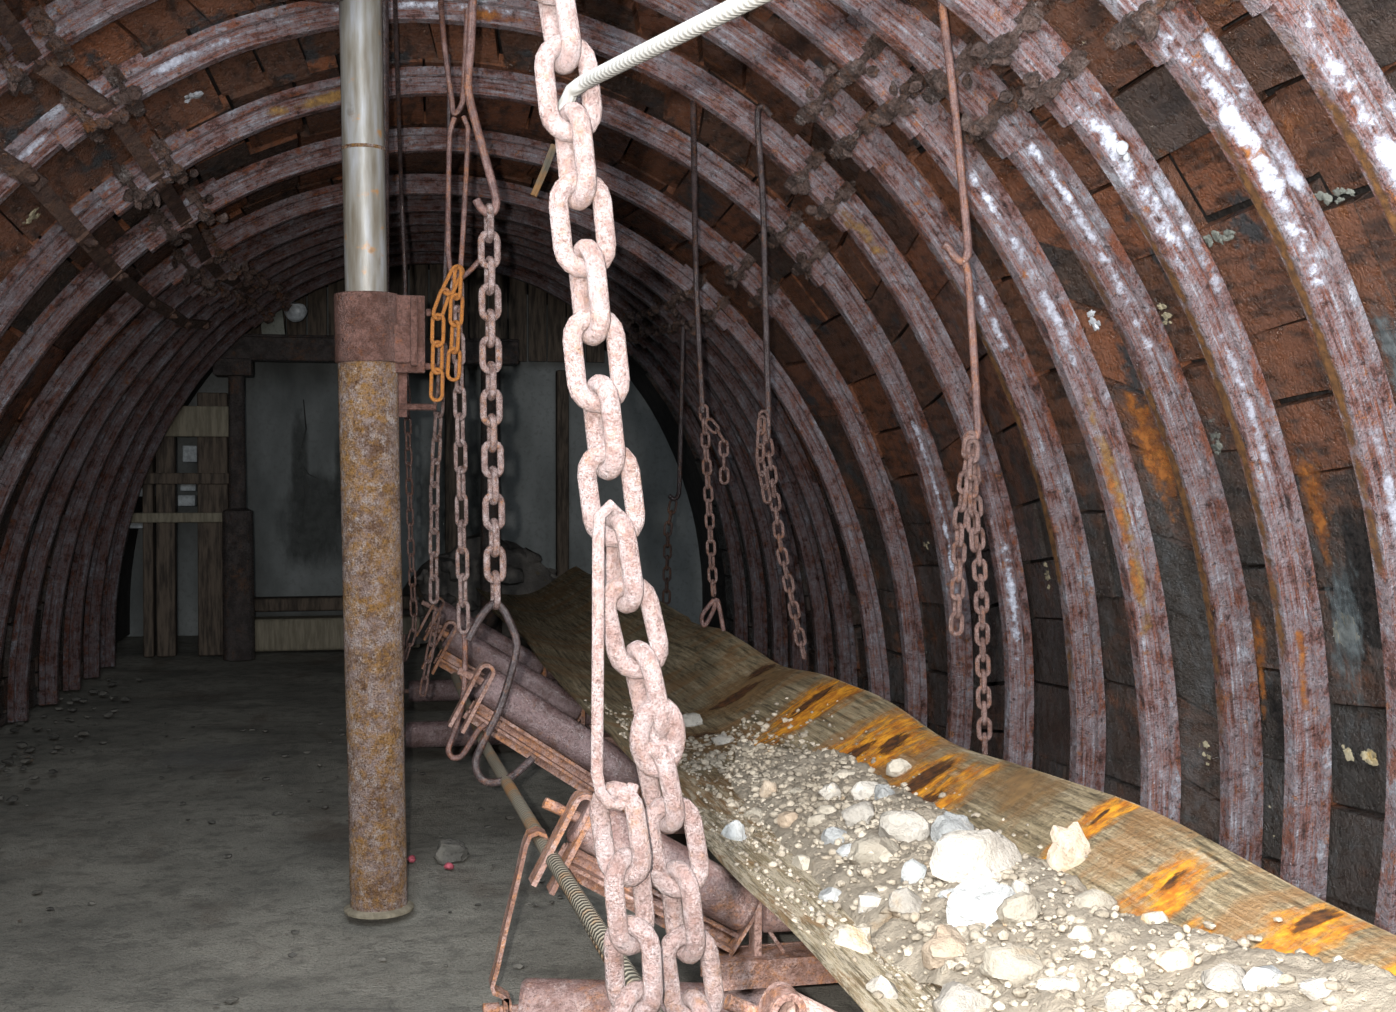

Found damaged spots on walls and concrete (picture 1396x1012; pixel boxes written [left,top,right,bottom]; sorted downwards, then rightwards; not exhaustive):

damp [1090,119,1198,247]
damp [1163,34,1323,285]
damp [1314,46,1396,180]
corrosion [1102,442,1132,542]
corrosion [1126,199,1308,734]
damp [1227,354,1270,473]
damp [1384,476,1396,529]